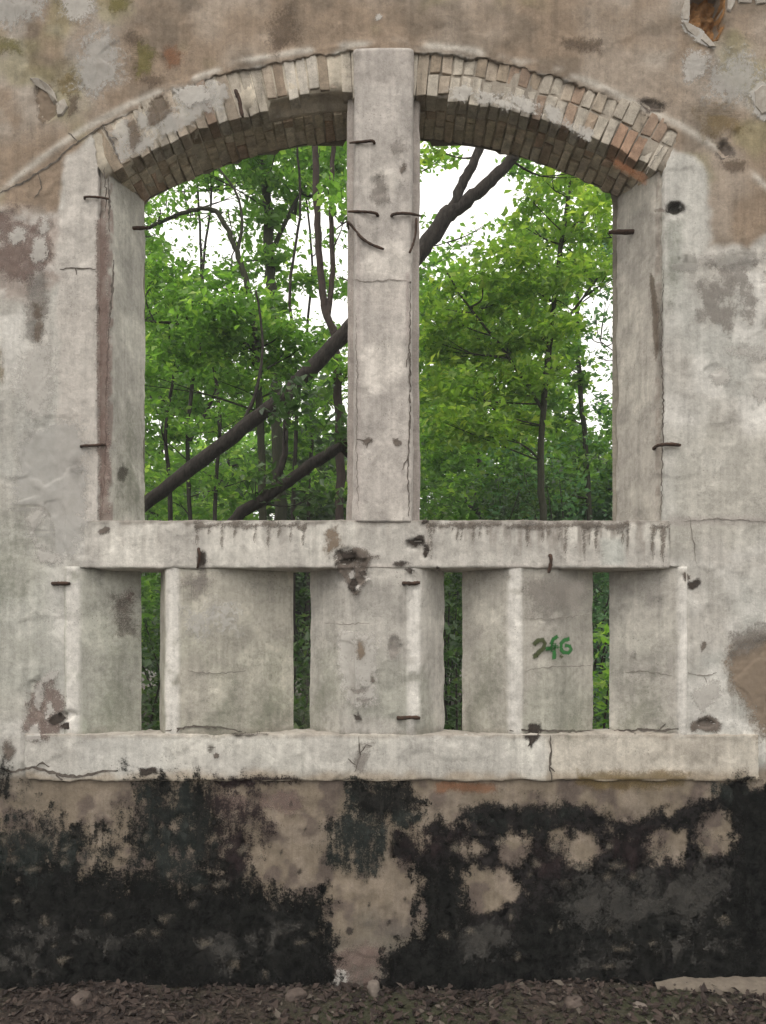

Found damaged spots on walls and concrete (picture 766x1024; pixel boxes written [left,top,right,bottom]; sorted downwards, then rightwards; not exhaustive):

flaking render [0,0,122,123]
spalling [681,0,766,121]
peeling [112,82,228,162]
peeling [448,85,594,141]
spalling [638,97,667,113]
water stain [194,519,307,547]
spalling [324,526,379,596]
spalling [22,670,69,742]
spalling [690,623,766,738]
crack [0,761,118,782]
crack [509,724,679,782]
water stain [0,743,766,993]